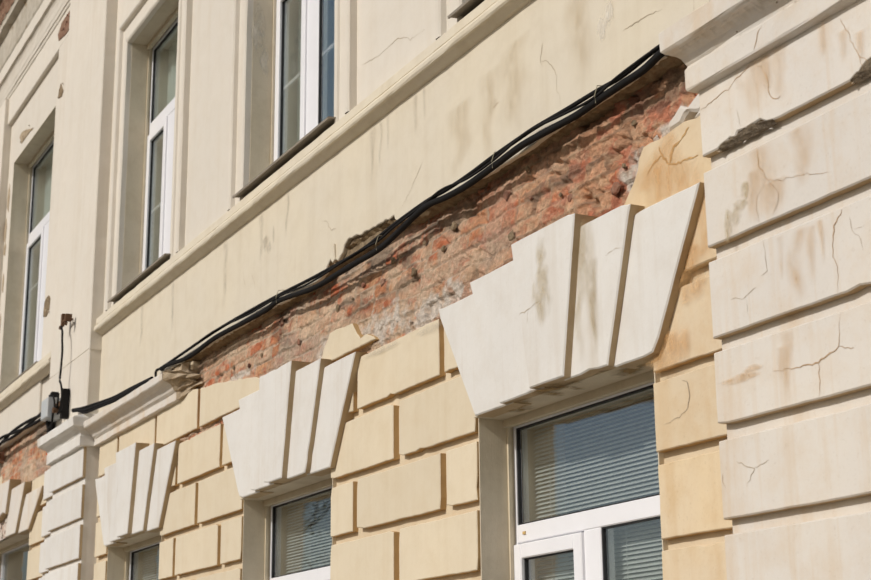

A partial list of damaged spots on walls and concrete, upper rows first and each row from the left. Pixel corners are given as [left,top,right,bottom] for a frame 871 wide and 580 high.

spalling [850,58,871,85]
spalling [717,119,778,153]
crack [756,148,826,218]
flaking render [196,63,700,389]
crack [832,210,862,286]
crack [777,319,854,394]
flaking render [0,422,50,484]
flaking render [180,418,224,441]